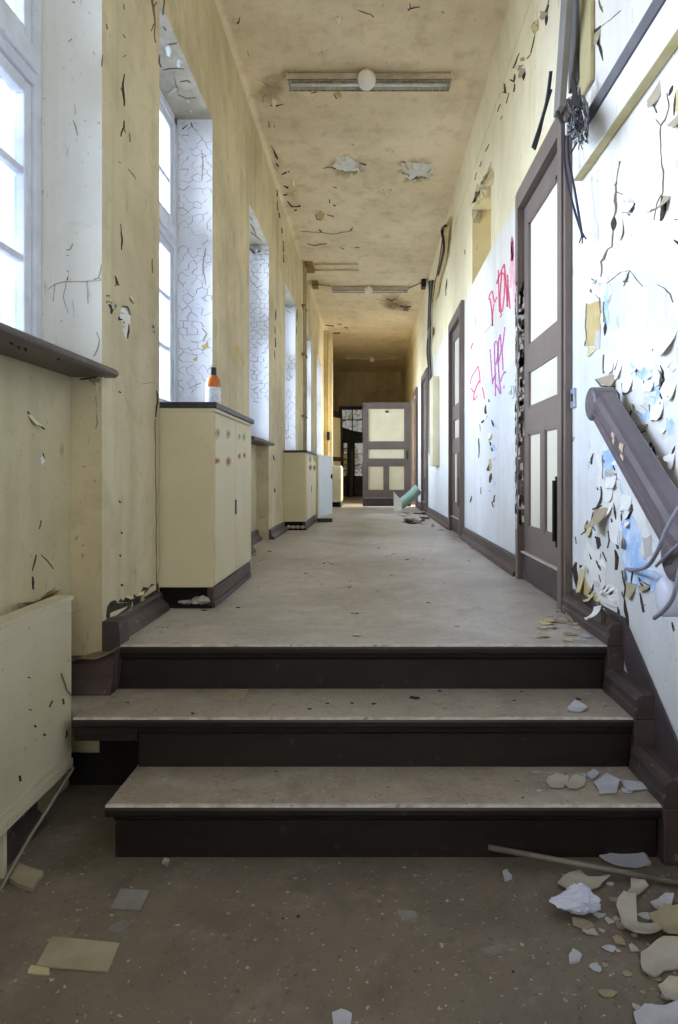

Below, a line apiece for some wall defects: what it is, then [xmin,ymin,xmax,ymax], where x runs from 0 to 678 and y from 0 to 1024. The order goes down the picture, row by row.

crack [101,4,136,179]
peeling [497,0,549,112]
peeling [647,81,678,129]
crack [48,224,123,311]
crack [301,227,359,250]
spalling [472,168,494,224]
crack [600,161,673,303]
crack [653,93,678,245]
peeling [584,278,678,489]
peeling [481,399,497,507]
peeling [535,443,662,642]
spalling [106,582,159,619]